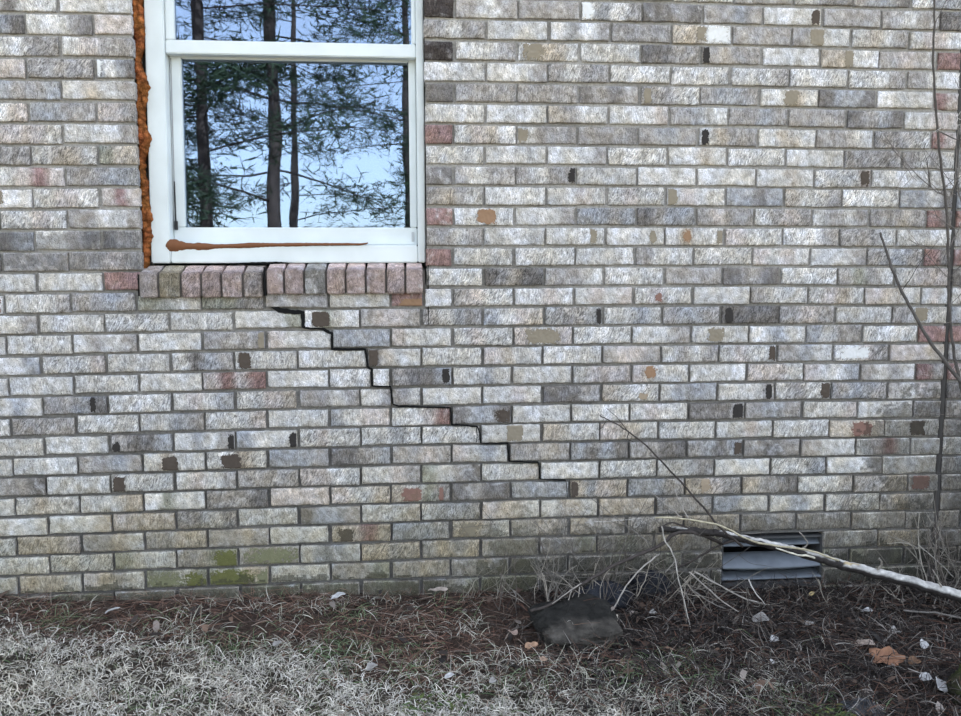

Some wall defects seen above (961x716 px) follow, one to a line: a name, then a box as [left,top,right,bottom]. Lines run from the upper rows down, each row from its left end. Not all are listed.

crack [231,262,568,498]